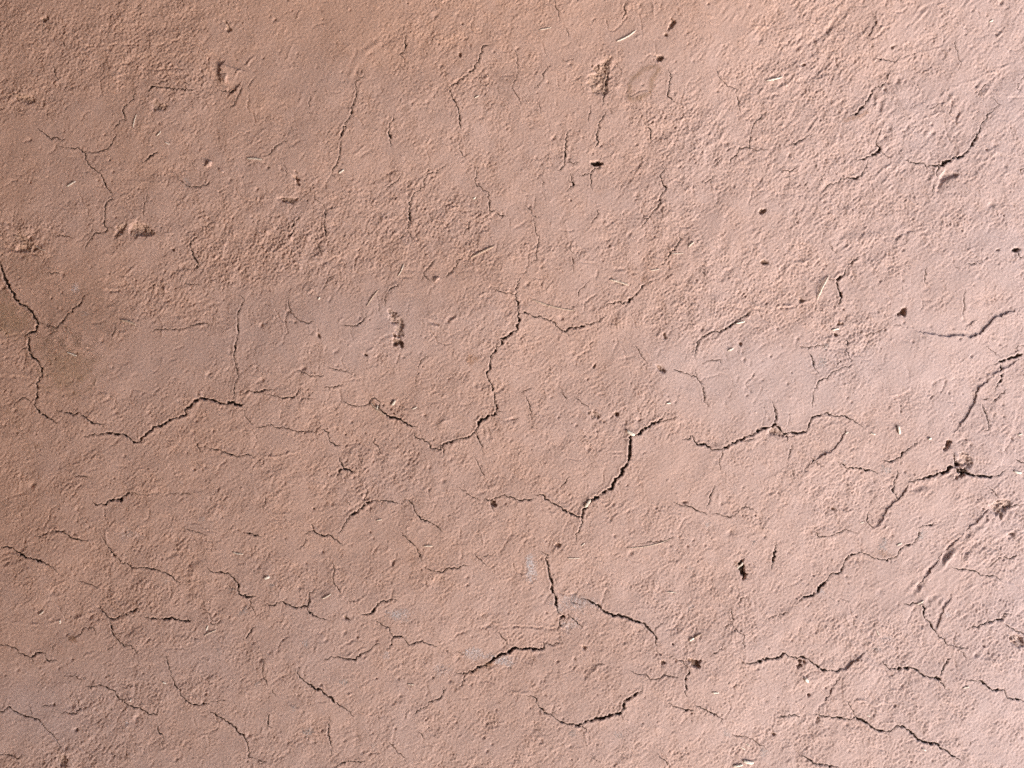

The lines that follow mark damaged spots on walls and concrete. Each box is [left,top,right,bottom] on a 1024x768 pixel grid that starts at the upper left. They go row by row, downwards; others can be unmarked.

crack [702,69,809,183]
crack [852,57,900,115]
crack [827,77,1024,192]
crack [831,246,860,307]
crack [0,45,764,767]
crack [460,325,1024,541]
crack [712,512,937,672]
crack [952,554,1020,581]
crack [882,602,1024,702]
crack [778,703,973,760]